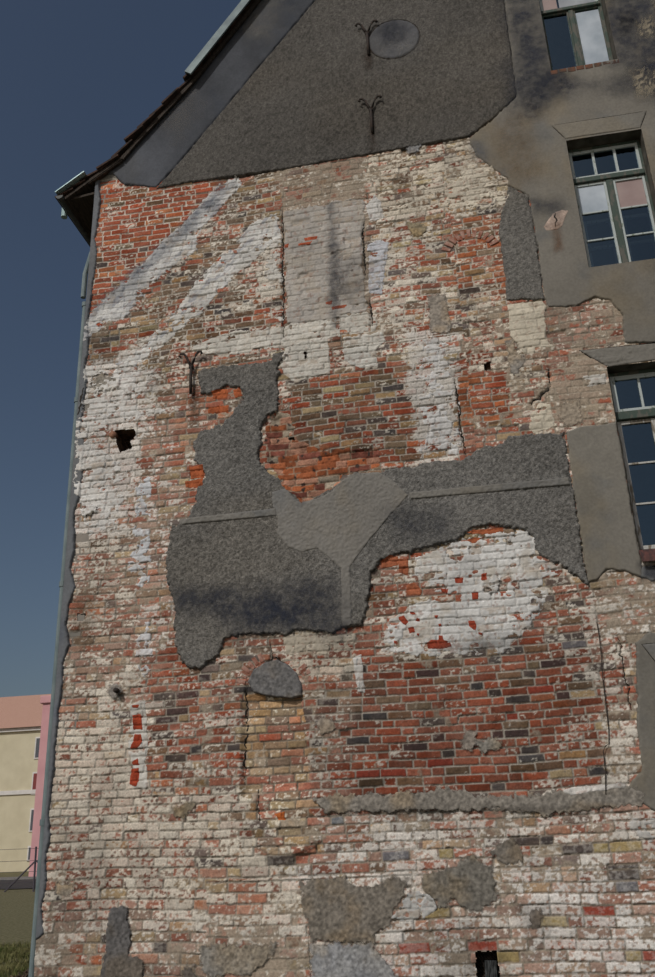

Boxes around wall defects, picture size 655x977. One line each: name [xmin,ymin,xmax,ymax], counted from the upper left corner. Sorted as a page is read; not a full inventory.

flaking render [108,0,655,354]
flaking render [185,195,386,518]
peeling [412,336,454,400]
crack [531,368,551,405]
peeling [583,374,606,387]
peeling [35,175,282,940]
flaking render [165,402,655,670]
crack [242,682,260,821]
peeling [353,654,365,693]
flaking render [563,632,655,843]
peeling [391,891,437,922]